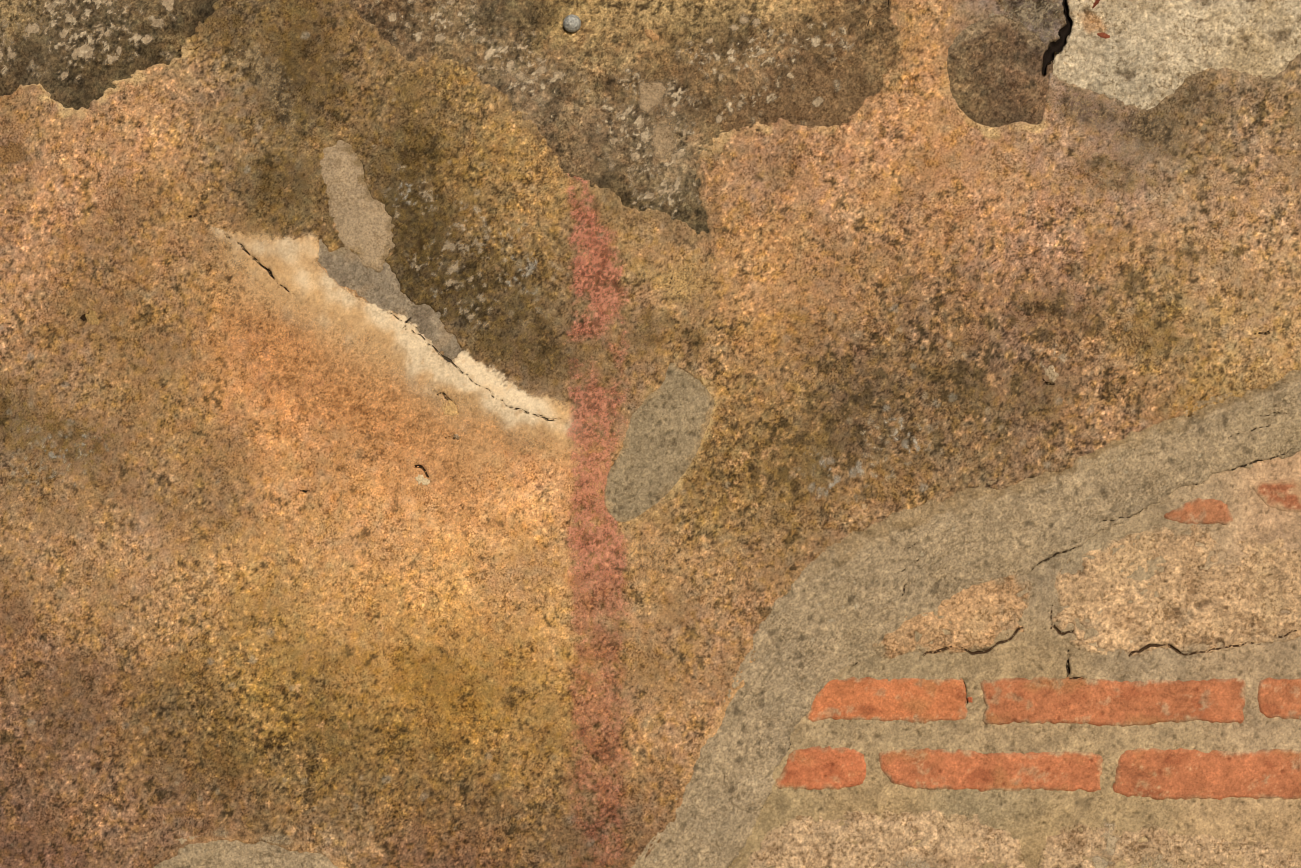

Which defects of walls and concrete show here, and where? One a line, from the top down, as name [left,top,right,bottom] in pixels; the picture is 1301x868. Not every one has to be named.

peeling [0,0,226,110]
peeling [349,0,899,234]
crack [1042,0,1072,75]
flaking render [947,0,1301,127]
flaking render [318,239,462,362]
damp [217,229,578,452]
crack [387,312,557,421]
flaking render [1043,365,1059,385]